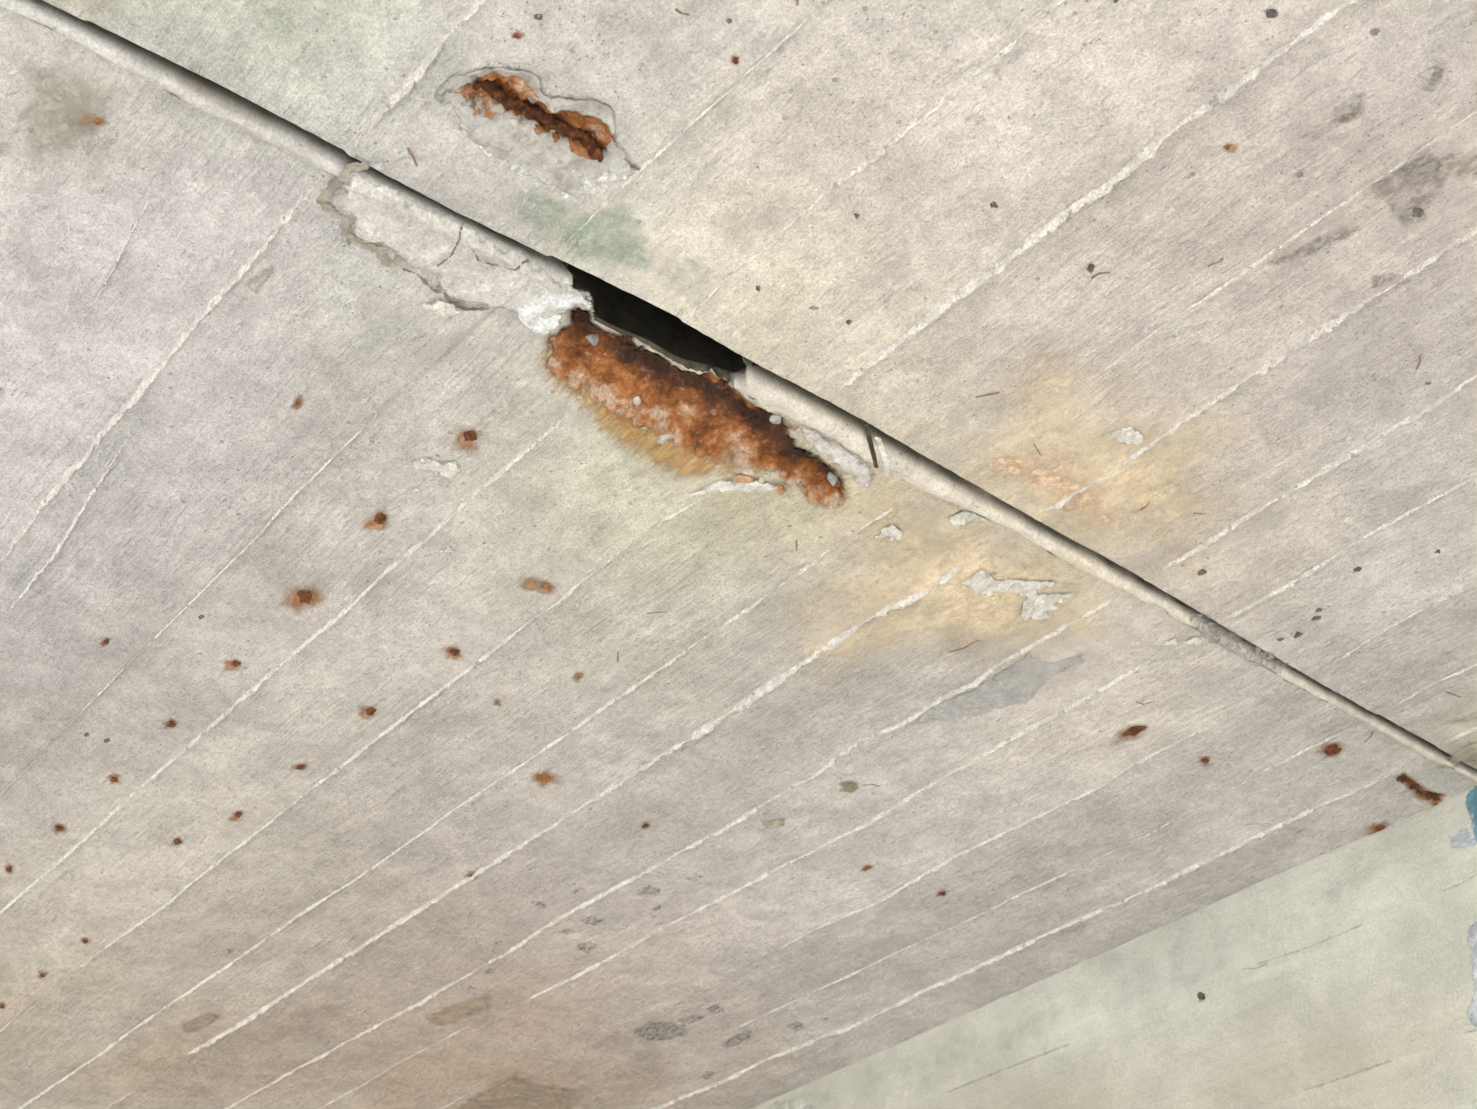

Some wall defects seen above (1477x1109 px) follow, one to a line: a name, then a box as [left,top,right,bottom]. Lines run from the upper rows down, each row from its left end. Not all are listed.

spalling [434,67,640,198]
crack [437,223,529,271]
spalling [517,261,872,509]
rust [365,512,387,529]
rust [287,589,320,609]
peeling [962,570,1071,621]
rust [446,647,460,659]
rust [360,708,376,718]
rust [1119,726,1147,739]
rust [1323,745,1341,756]
rust [534,772,554,786]
peeling [1467,922,1477,1027]